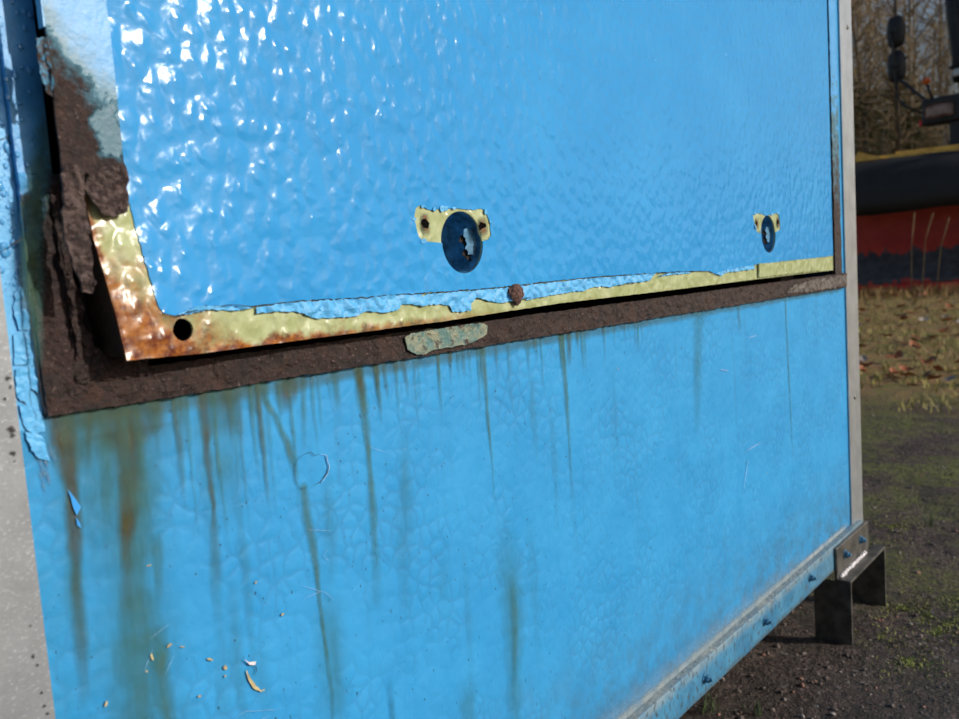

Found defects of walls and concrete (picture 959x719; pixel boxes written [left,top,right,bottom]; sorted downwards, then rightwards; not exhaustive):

peeling [35,37,66,97]
peeling [88,198,824,357]
peeling [13,285,51,461]
rust [51,409,92,601]
peeling [68,490,81,528]
rust [108,399,161,547]
rust [199,392,209,462]